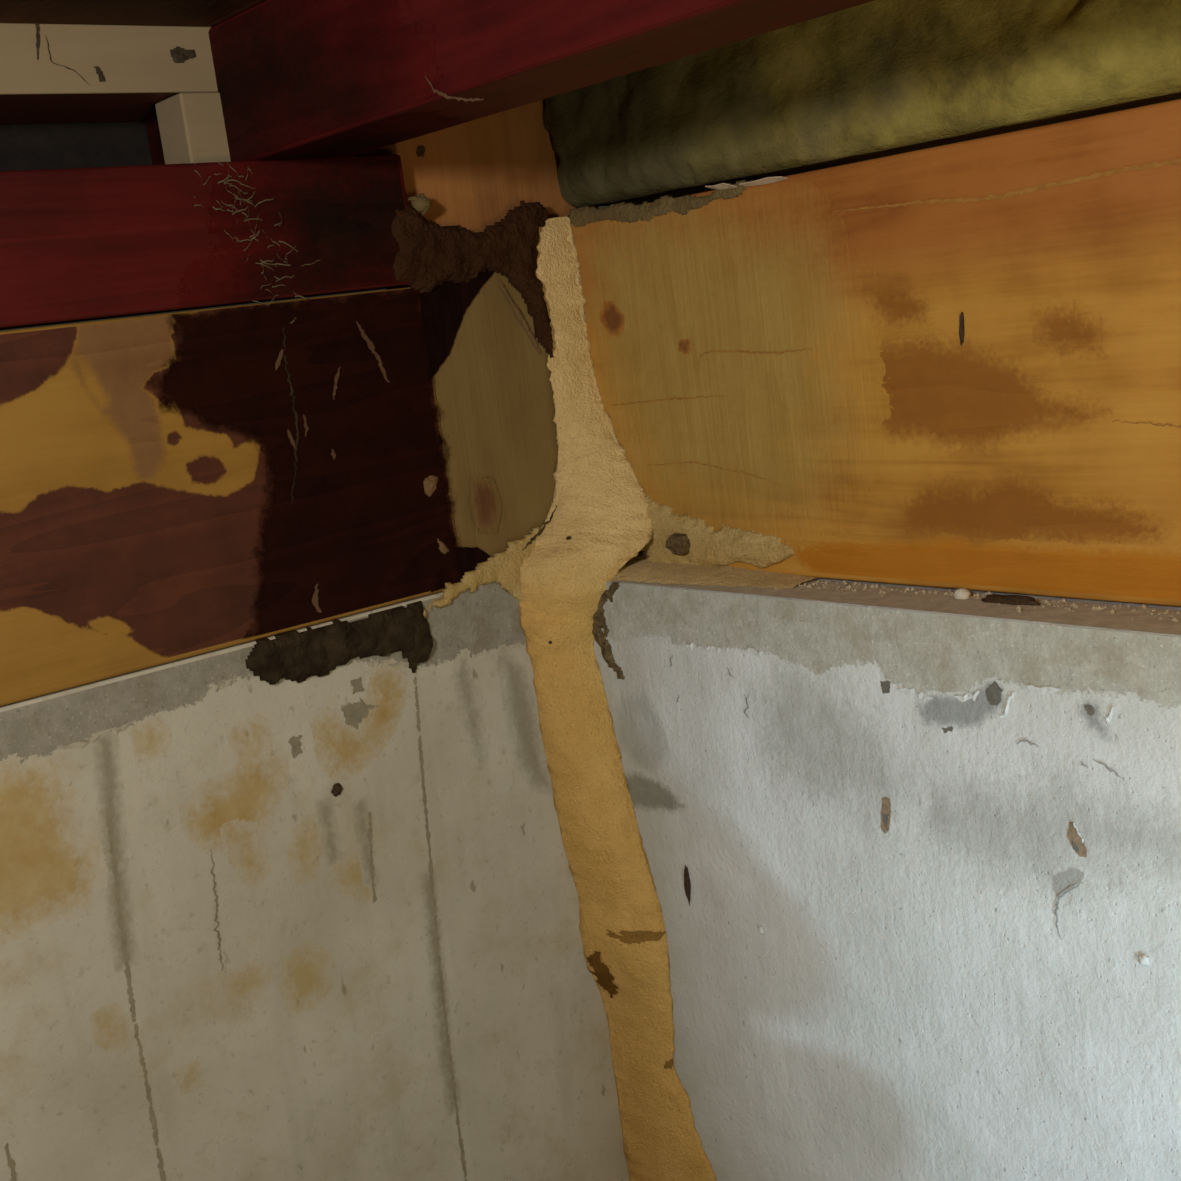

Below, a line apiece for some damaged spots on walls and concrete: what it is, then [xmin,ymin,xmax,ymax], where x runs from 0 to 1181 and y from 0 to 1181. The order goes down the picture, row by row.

water stain [0,0,496,658]
water stain [570,178,1181,600]
peeling [0,646,255,764]
peeling [342,582,527,730]
peeling [592,580,1181,745]